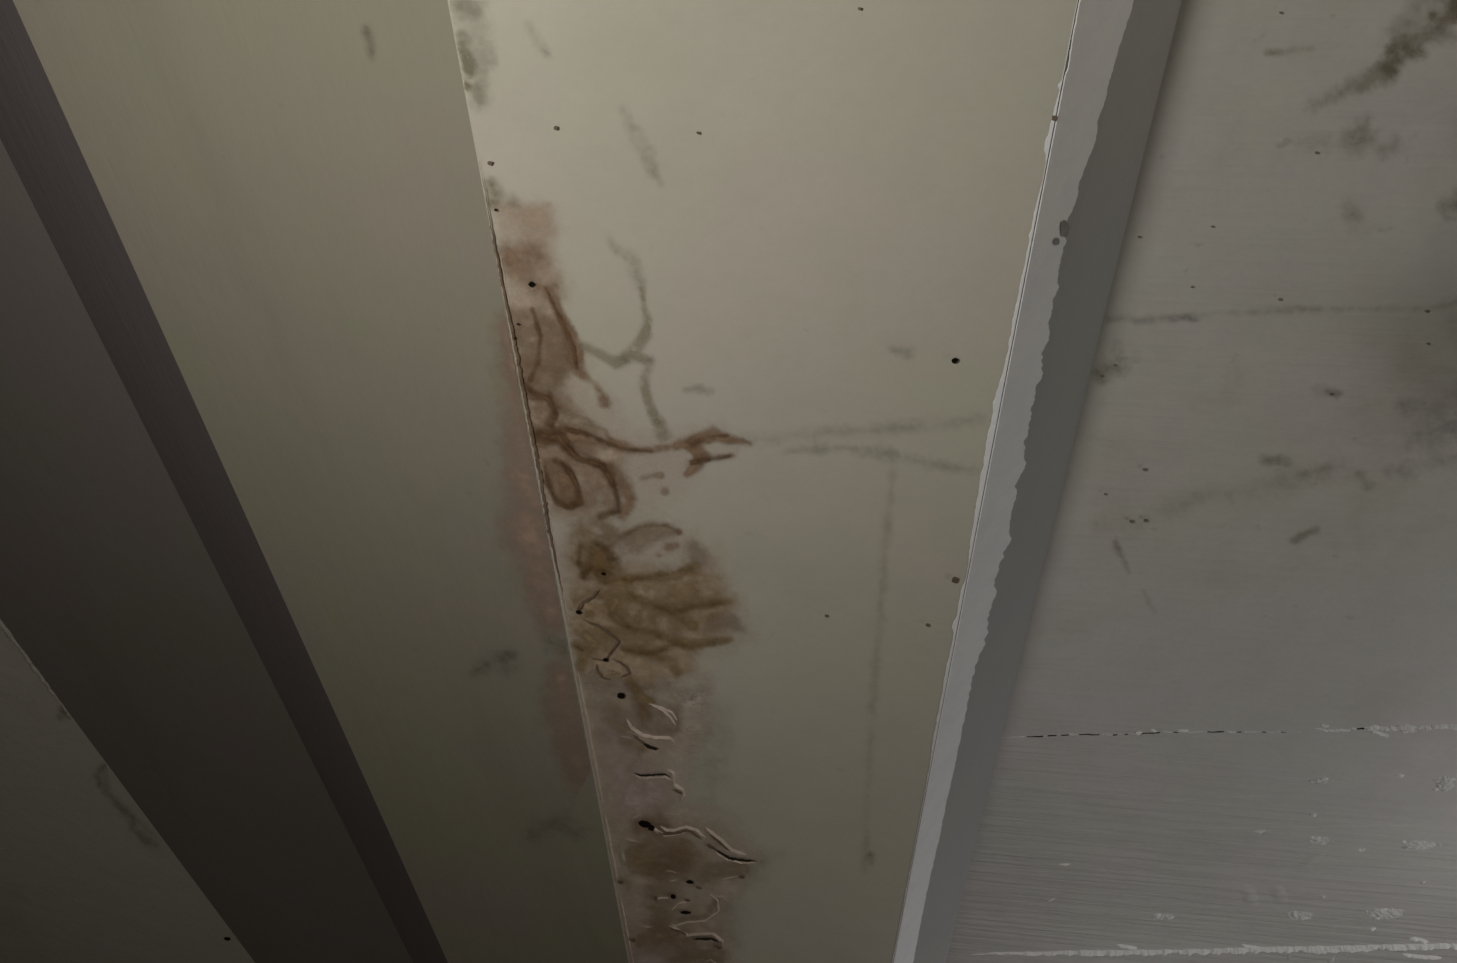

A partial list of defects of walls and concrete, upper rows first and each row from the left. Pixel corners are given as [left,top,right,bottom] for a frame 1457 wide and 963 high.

damp [571,523,739,705]
peeling [582,679,761,963]